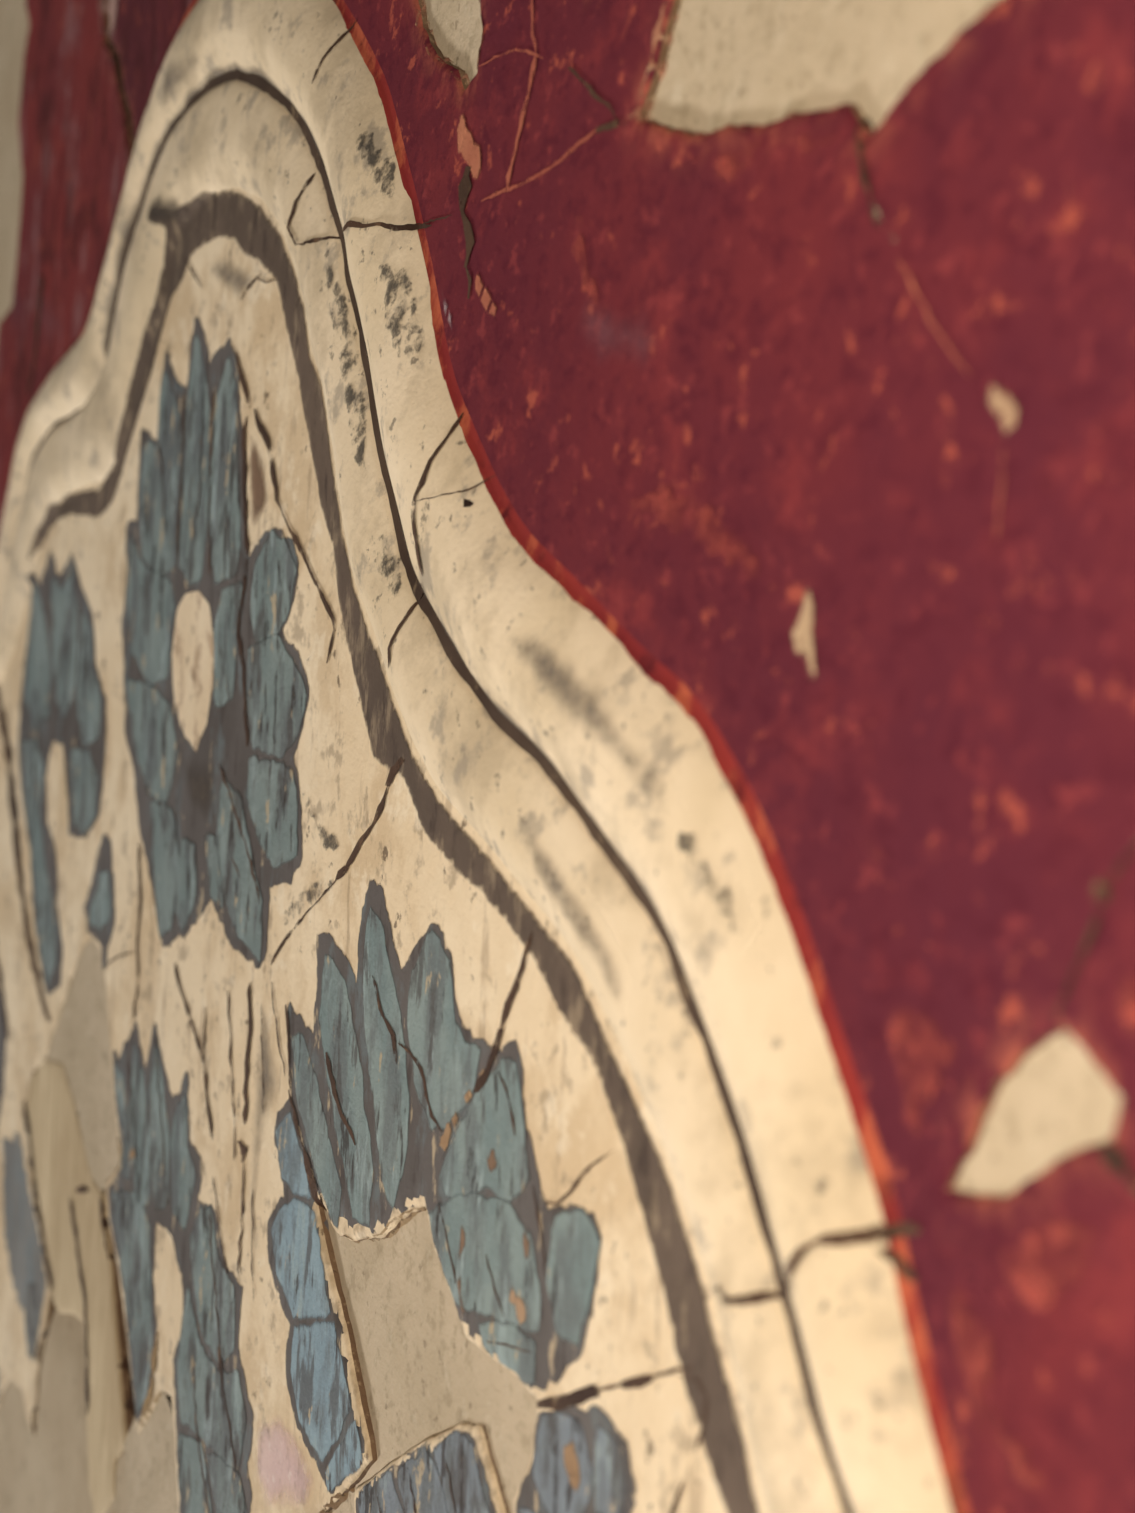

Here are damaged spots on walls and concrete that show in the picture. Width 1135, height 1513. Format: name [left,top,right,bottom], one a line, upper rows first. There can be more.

flaking render [415,0,484,85]
flaking render [628,0,999,138]
crack [159,346,335,900]
crack [387,413,495,668]
spalling [792,593,815,674]
crack [102,757,404,1513]
crack [473,932,532,1136]
flaking render [945,1030,1123,1200]
flaking render [0,1306,179,1513]
flaking render [319,1208,538,1513]
crack [537,1367,707,1513]
crack [714,1222,921,1306]